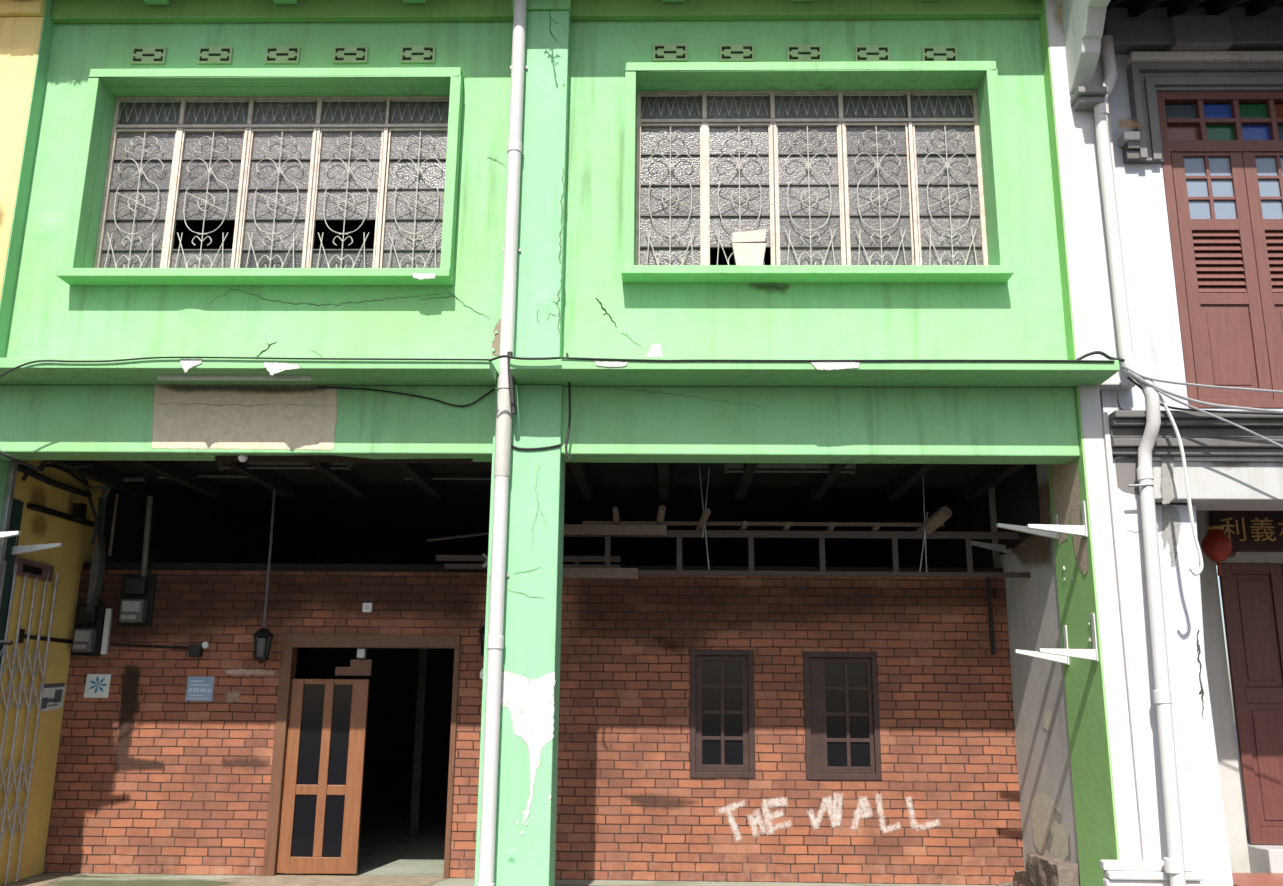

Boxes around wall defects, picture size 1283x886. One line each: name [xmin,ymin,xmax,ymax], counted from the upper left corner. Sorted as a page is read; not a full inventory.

crack [209,289,490,320]
crack [536,168,565,333]
crack [595,297,642,348]
crack [509,466,548,599]
peeling [1052,460,1089,581]
crack [1196,630,1204,719]
peeling [501,670,556,835]
peeling [1030,792,1069,861]